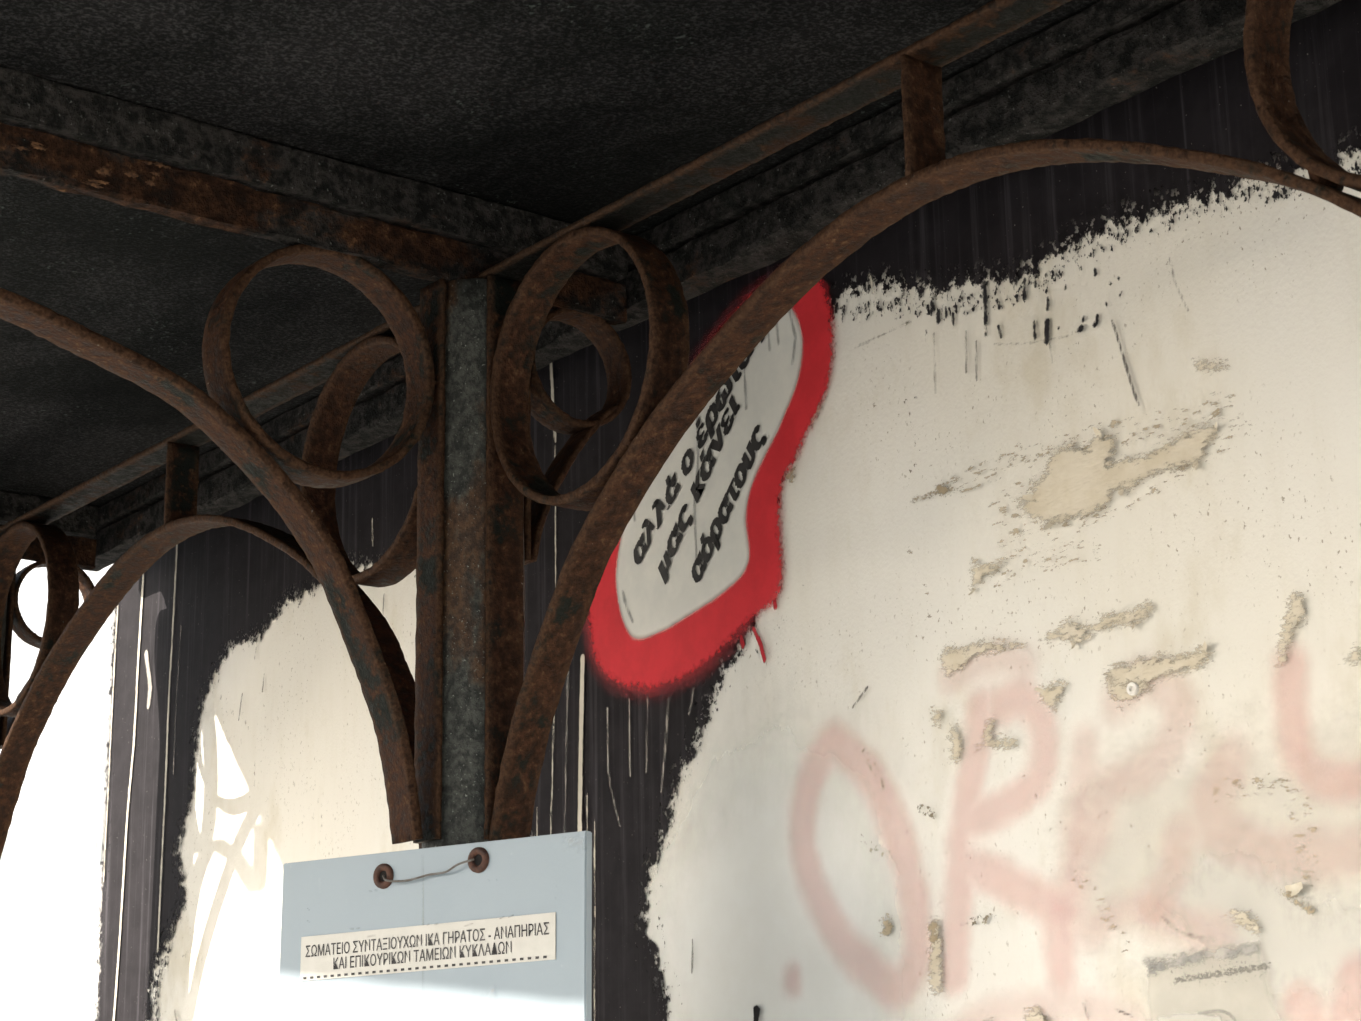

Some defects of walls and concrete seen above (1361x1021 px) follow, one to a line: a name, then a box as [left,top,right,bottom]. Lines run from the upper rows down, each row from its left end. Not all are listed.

corrosion [82,160,171,189]
peeling [912,392,1244,595]
peeling [940,638,1024,677]
peeling [1046,599,1154,649]
peeling [1103,641,1214,708]
peeling [1274,592,1305,677]